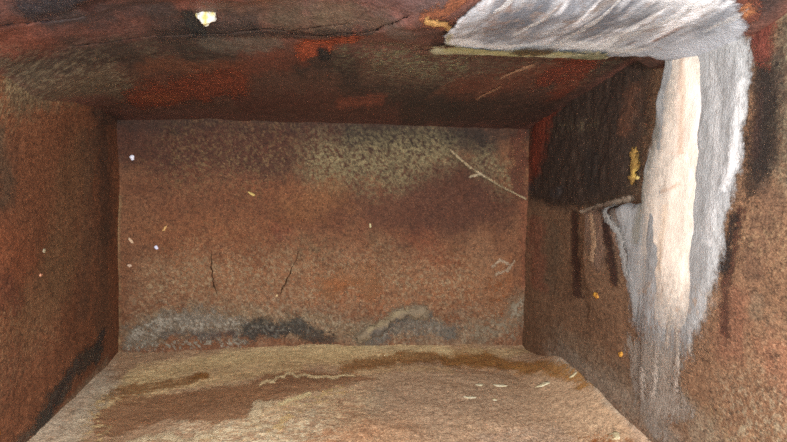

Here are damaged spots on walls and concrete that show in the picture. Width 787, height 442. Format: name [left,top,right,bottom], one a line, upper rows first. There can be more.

crack [71,16,408,46]
corrosion [296,34,360,63]
corrosion [419,0,467,33]
spalling [528,62,653,298]
crack [280,251,299,294]
leakage [122,304,336,351]
leakage [18,328,107,442]
leakage [82,351,442,442]